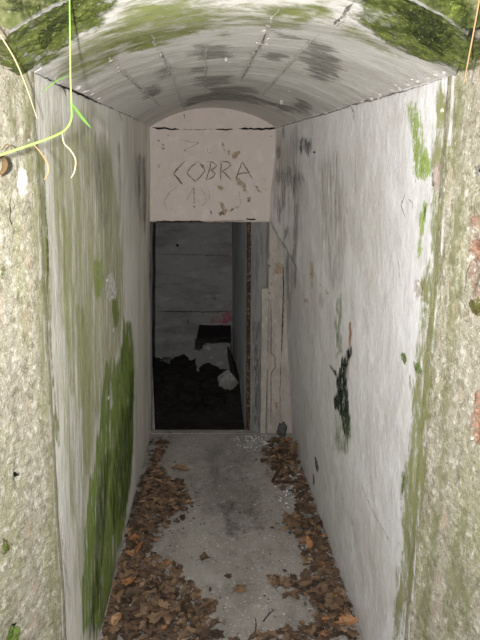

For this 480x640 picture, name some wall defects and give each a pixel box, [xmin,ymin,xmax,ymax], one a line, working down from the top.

crack [35,73,446,136]
damp [184,45,311,114]
crack [240,9,279,80]
damp [271,30,345,81]
damp [413,124,428,175]
damp [96,299,134,548]